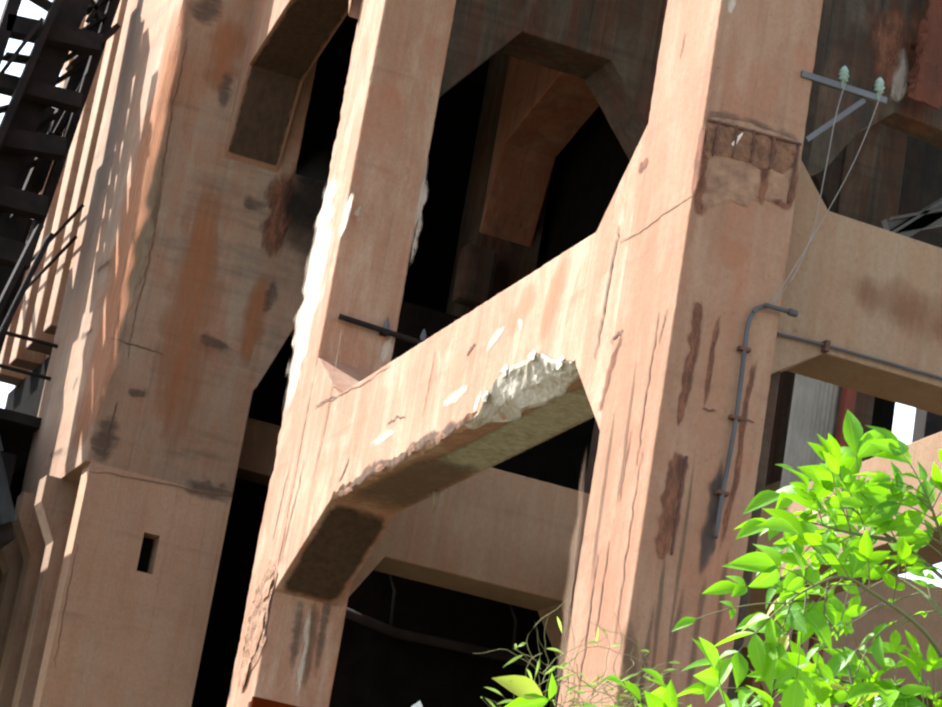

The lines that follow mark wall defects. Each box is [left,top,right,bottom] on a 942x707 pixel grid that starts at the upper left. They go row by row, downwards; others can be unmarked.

spalling [691,117,802,214]
rust [262,177,293,255]
crack [594,195,692,357]
crack [111,338,164,356]
rust [677,303,719,425]
spalling [338,349,580,496]
leakage [286,507,382,600]
rust [656,453,688,559]
leakage [298,612,316,685]